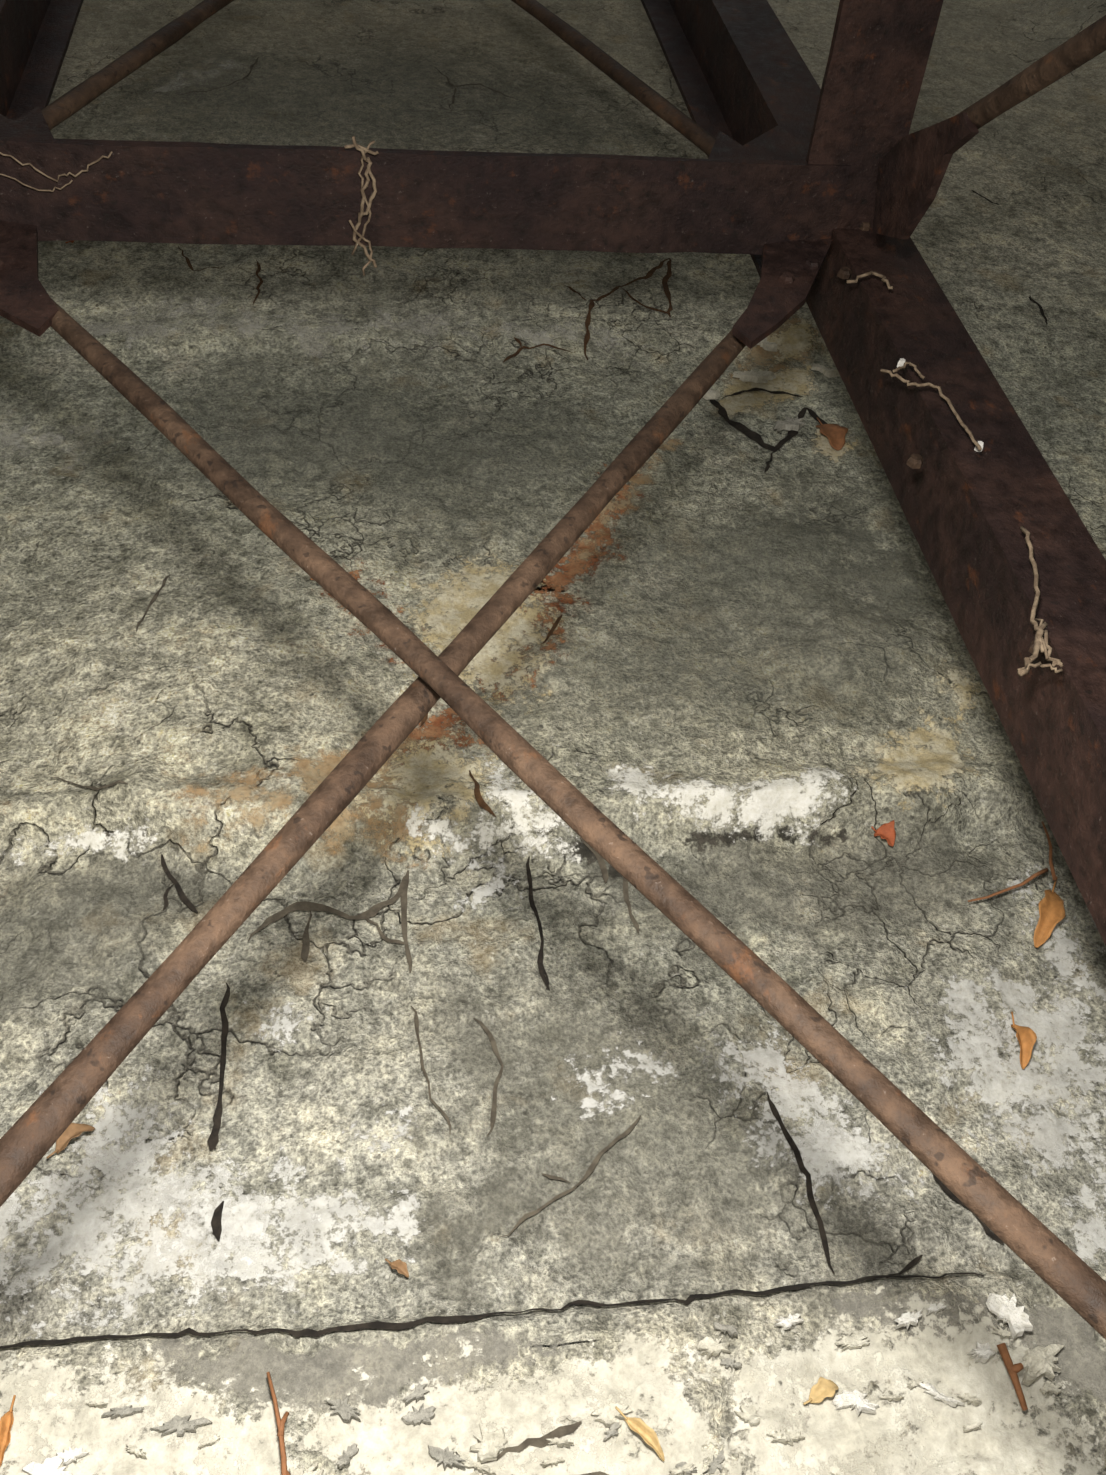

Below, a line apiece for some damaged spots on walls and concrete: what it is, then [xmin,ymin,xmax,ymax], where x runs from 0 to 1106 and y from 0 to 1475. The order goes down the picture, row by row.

crack [710,388,828,472]
rust [476,439,681,701]
water stain [406,750,581,912]
water stain [606,658,995,847]
crack [207,983,230,1150]
crack [0,1092,984,1349]
crack [933,1174,1004,1244]
crack [477,1421,582,1464]
crack [581,1467,609,1475]